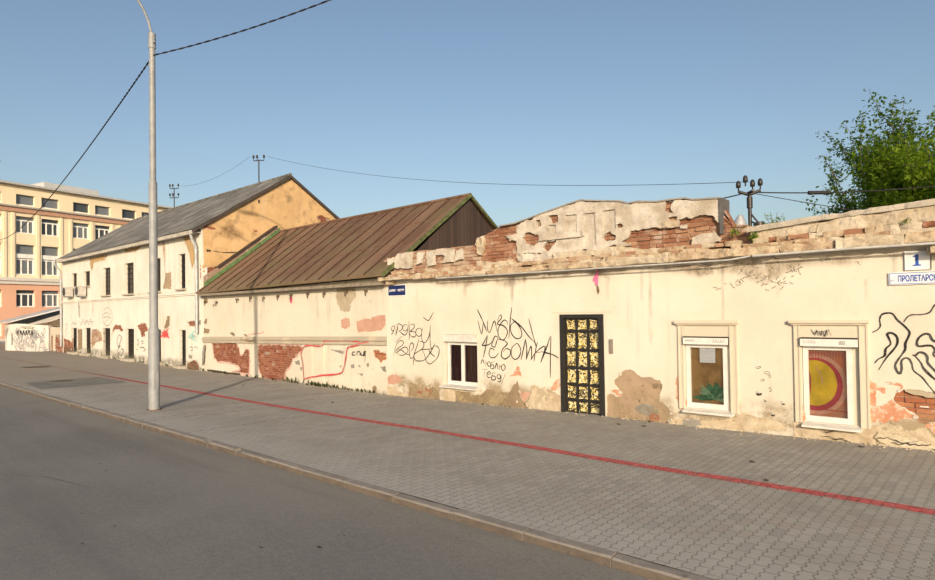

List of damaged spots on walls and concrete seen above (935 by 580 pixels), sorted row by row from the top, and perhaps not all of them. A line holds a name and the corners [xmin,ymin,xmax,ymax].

peeling [336,287,386,333]
flaking render [64,325,124,353]
flaking render [185,332,302,381]
flaking render [456,366,530,408]
flaking render [607,369,935,451]